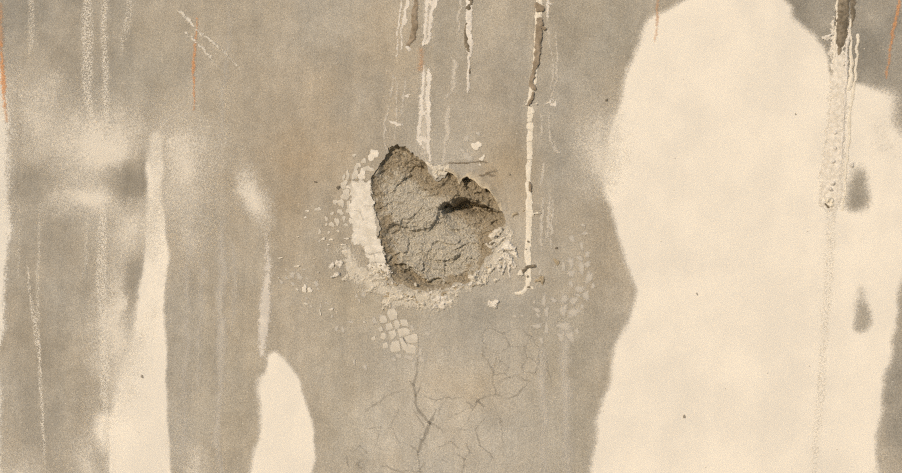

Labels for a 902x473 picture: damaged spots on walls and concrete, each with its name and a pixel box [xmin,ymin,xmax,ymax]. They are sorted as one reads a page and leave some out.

damp [17,204,46,455]
damp [81,0,111,133]
damp [83,201,110,472]
damp [213,222,237,473]
damp [257,235,275,358]
spalling [304,144,506,291]
damp [383,0,474,164]
peeling [460,132,485,166]
damp [515,0,561,295]
damp [817,0,860,212]